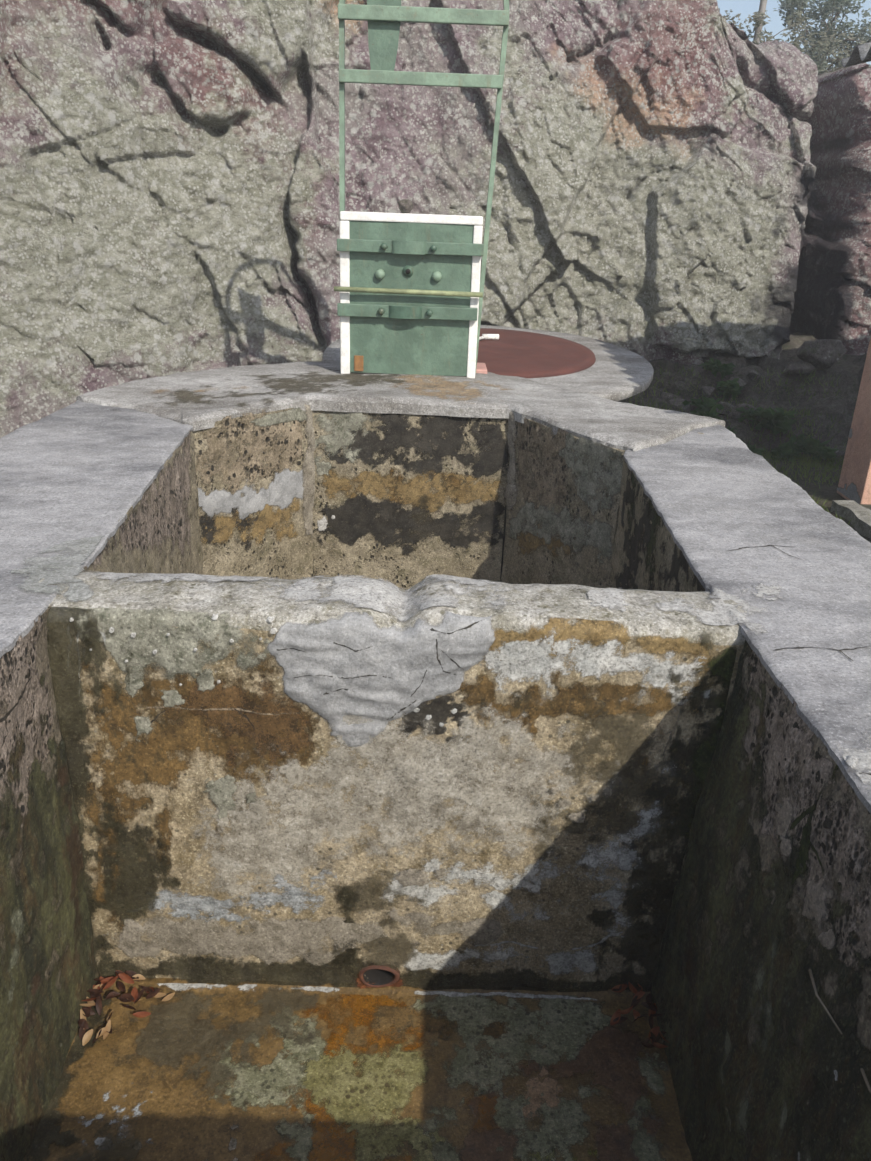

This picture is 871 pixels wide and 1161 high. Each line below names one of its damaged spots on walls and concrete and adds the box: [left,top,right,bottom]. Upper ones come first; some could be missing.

corrosion [79,652,320,875]
damp [82,469,784,1106]
damp [8,910,24,970]
corrosion [303,975,459,1064]
damp [48,1092,152,1161]
corrosion [254,1088,360,1161]